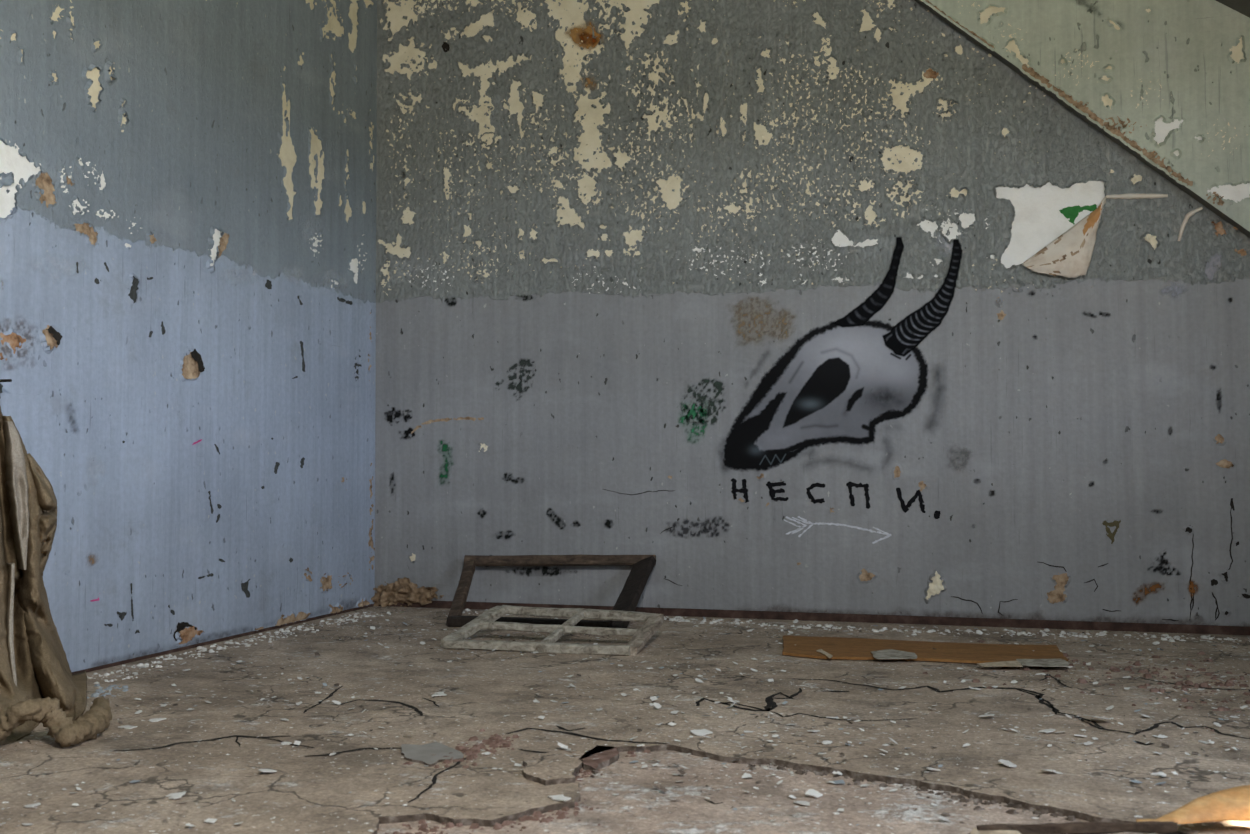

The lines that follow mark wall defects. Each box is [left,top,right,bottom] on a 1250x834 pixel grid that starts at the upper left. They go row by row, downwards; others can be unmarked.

corrosion [567,22,601,49]
peeling [0,137,159,251]
peeling [275,52,367,257]
peeling [304,0,1250,323]
flaking render [179,349,205,382]
flaking render [242,461,827,794]
crack [114,735,396,757]
crack [303,686,440,716]
crack [407,750,481,803]
crack [506,722,670,753]
crack [695,674,1250,745]
peeling [805,626,1250,811]